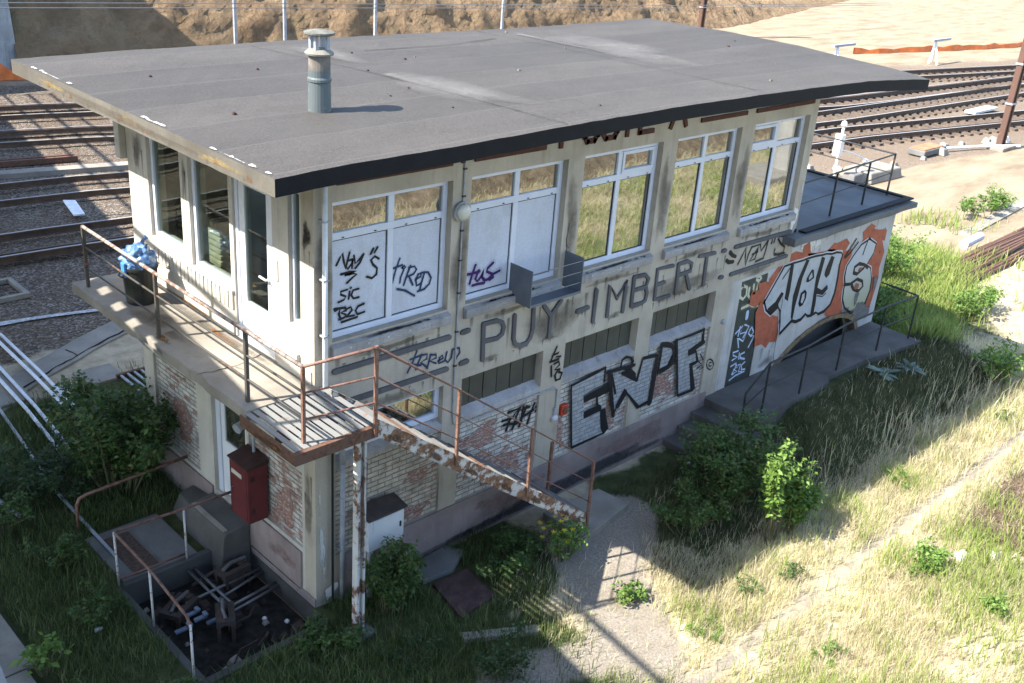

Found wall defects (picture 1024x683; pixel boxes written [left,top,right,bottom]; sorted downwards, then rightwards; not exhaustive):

peeling [165,381,198,444]
peeling [649,370,676,400]
peeling [459,419,529,470]
corrosion [359,462,368,563]